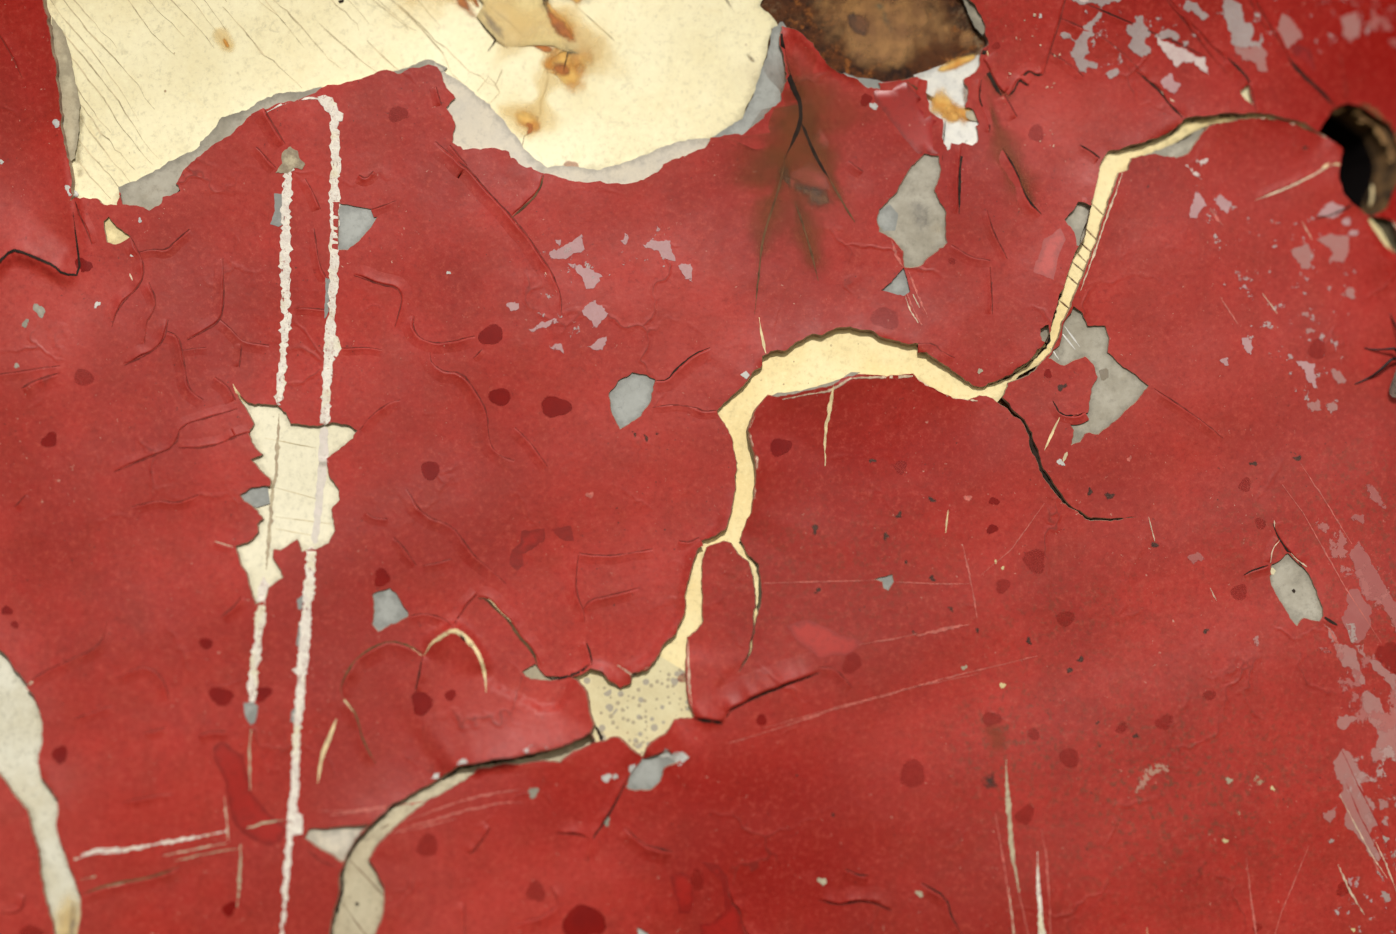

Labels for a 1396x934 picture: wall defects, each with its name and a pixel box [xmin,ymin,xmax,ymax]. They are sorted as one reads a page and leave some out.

peeling [43,0,795,257]
crack [755,27,863,308]
corrosion [760,0,986,82]
crack [947,0,1267,314]
crack [1252,156,1340,200]
crack [1315,204,1396,253]
peeling [233,385,357,605]
peeling [522,0,1396,793]
crack [1045,401,1089,462]
peeling [0,651,81,934]
peeling [213,742,369,863]
peeling [1270,514,1396,932]